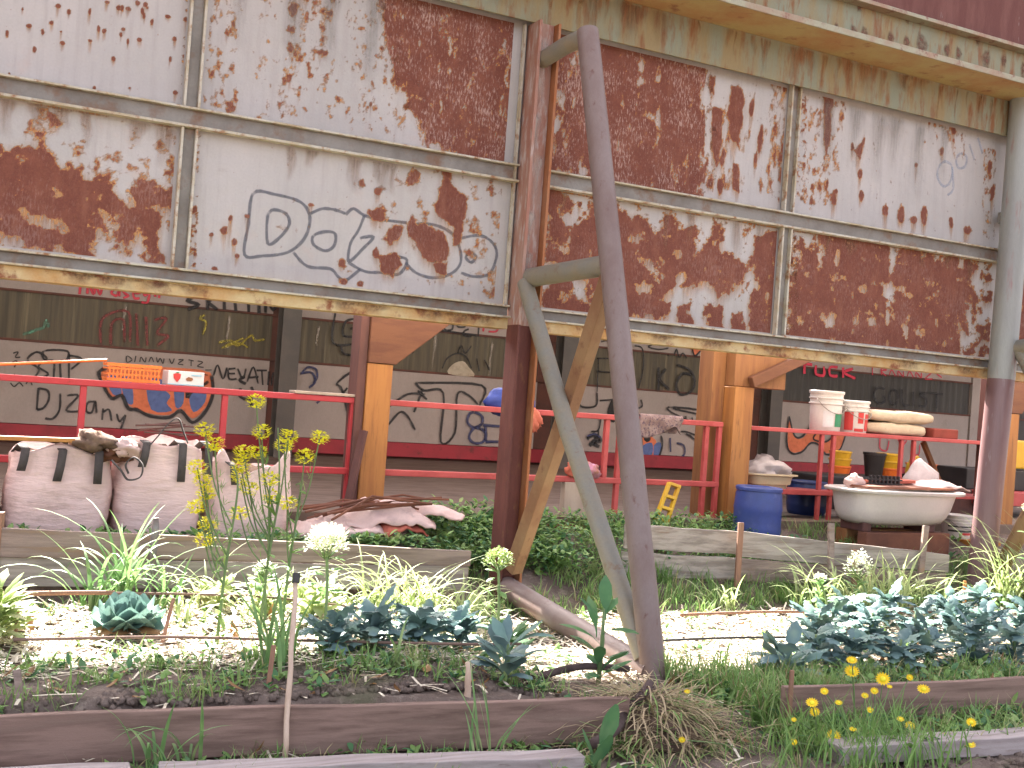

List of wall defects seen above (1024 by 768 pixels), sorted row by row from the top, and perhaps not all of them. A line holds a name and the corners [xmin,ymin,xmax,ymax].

rust [0,104,175,264]
rust [204,0,238,113]
rust [257,0,514,161]
rust [359,171,500,286]
rust [542,277,599,312]
rust [551,50,591,177]
rust [544,189,599,264]
rust [600,44,787,201]
rust [617,204,777,333]
rust [795,97,846,207]
rust [786,230,993,364]
rust [882,204,928,227]